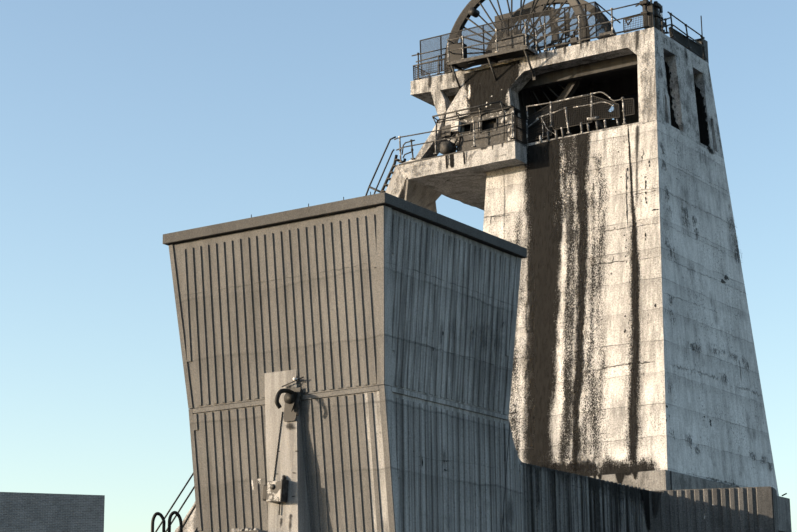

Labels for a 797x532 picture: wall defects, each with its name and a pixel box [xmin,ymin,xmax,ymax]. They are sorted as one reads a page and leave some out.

damp [508,125,661,532]